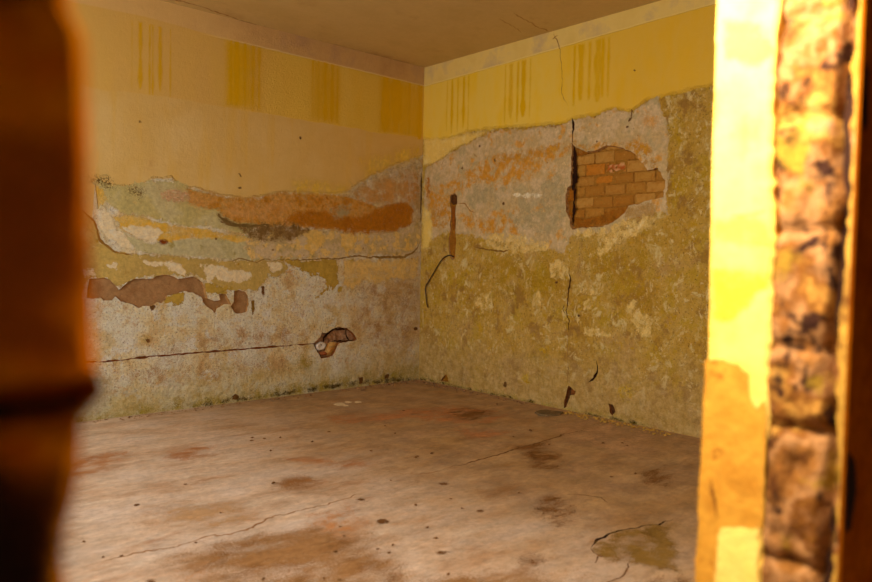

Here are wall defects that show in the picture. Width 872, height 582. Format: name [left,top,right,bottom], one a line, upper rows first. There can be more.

damp [503,60,532,122]
damp [572,38,611,106]
peeling [90,95,670,314]
flaking render [314,327,356,359]
damp [266,474,322,491]
crack [74,493,361,570]
damp [129,497,598,582]
damp [592,522,691,582]